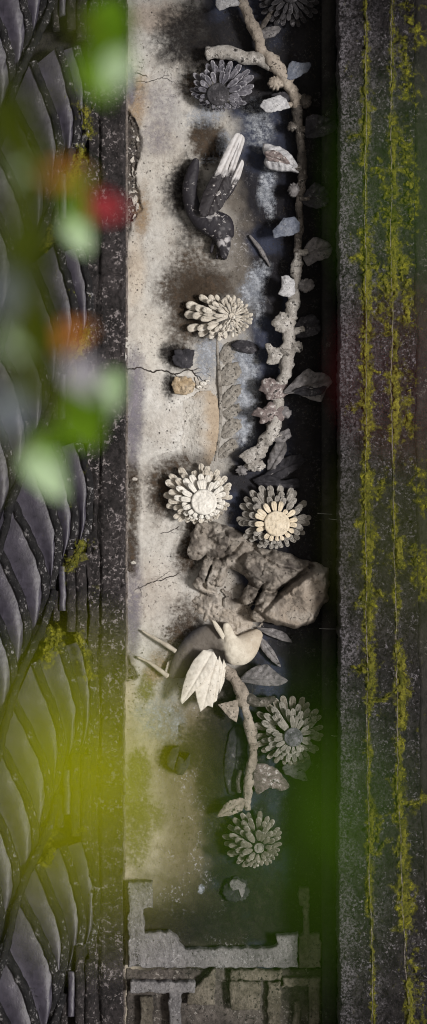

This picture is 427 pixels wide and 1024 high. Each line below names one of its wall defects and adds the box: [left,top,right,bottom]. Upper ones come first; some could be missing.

crack [126,367,210,381]